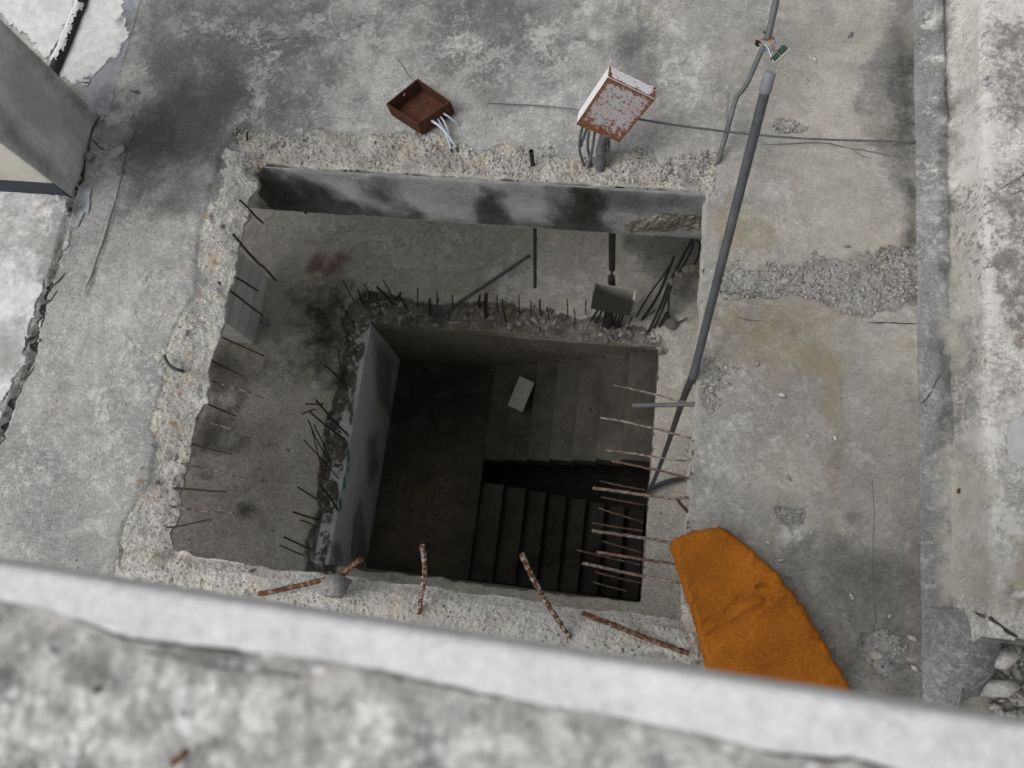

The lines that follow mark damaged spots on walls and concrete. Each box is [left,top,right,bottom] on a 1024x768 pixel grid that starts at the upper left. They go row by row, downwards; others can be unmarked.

leakage [114,0,354,210]
crack [0,117,104,444]
leakage [244,167,682,324]
spalling [719,245,922,318]
spalling [115,127,718,666]
leakage [634,304,752,495]
spalling [700,357,738,412]